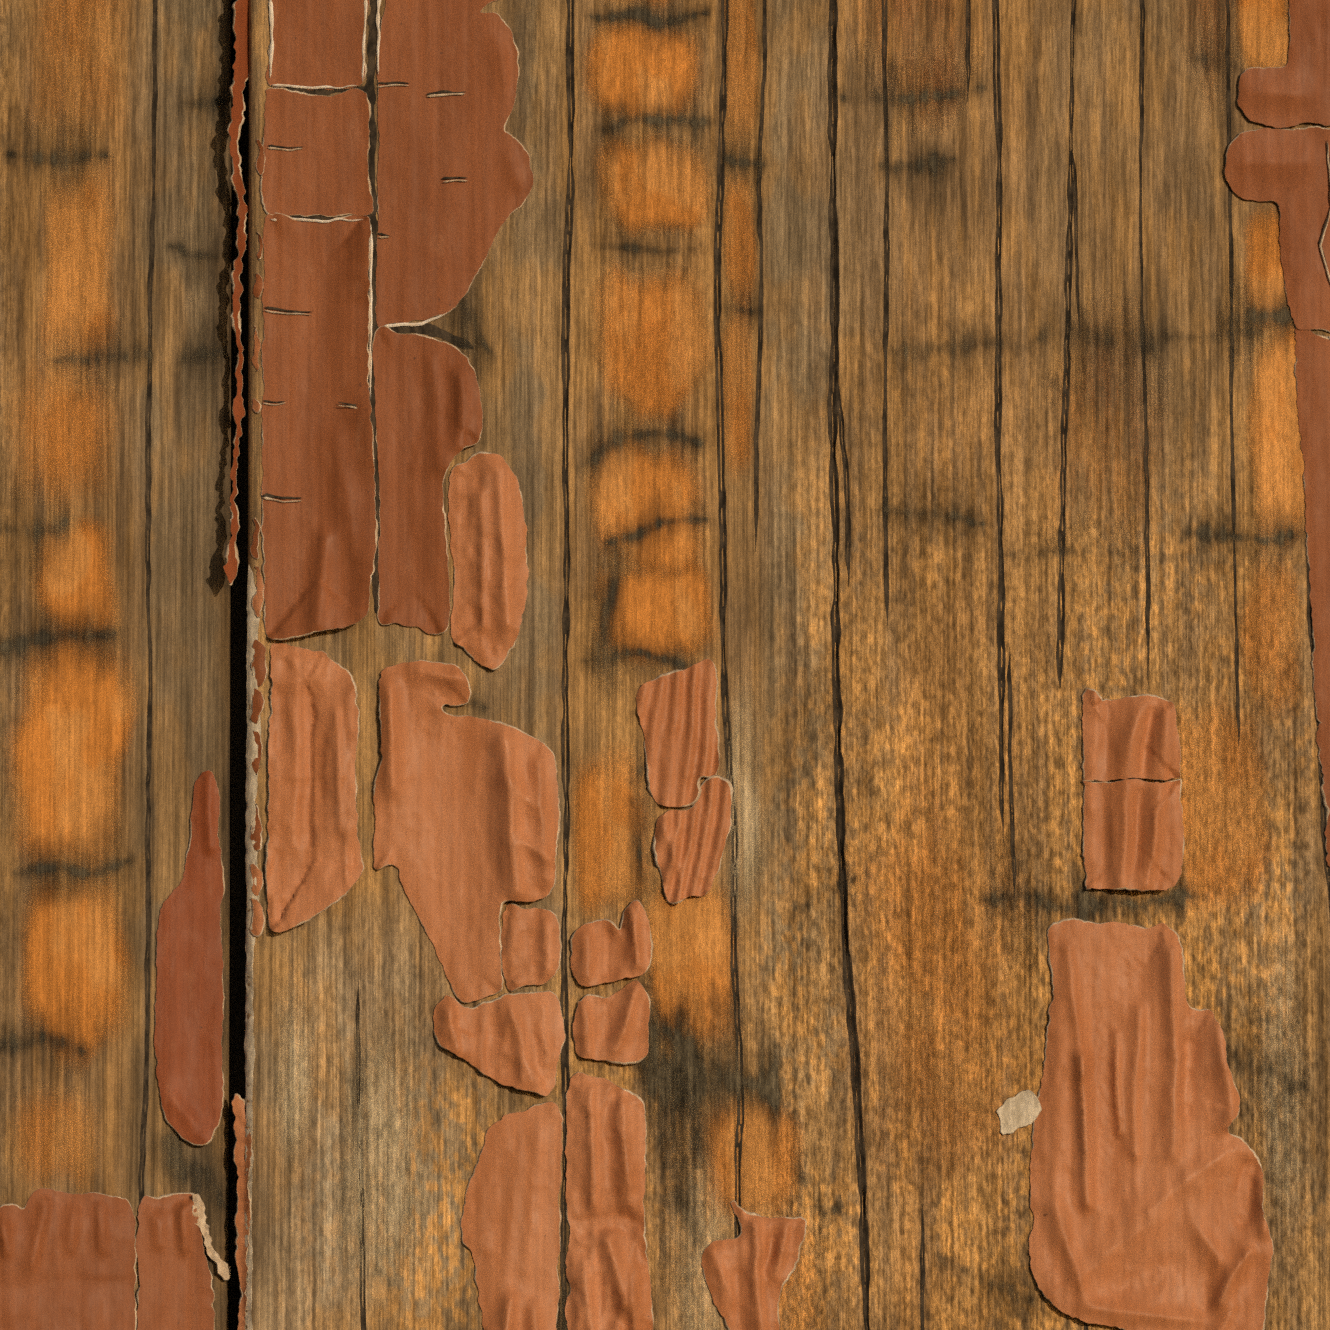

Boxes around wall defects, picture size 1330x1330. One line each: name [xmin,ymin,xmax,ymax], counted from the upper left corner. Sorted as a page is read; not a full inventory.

peeling [0,0,654,1330]
peeling [636,658,733,905]
crack [714,0,767,1238]
peeling [701,1200,807,1330]
crack [828,0,870,1330]
crack [882,0,890,626]
crack [966,0,1017,899]
crack [1056,0,1080,688]
peeling [1081,687,1185,892]
peeling [996,918,1274,1330]
peeling [1224,0,1330,867]